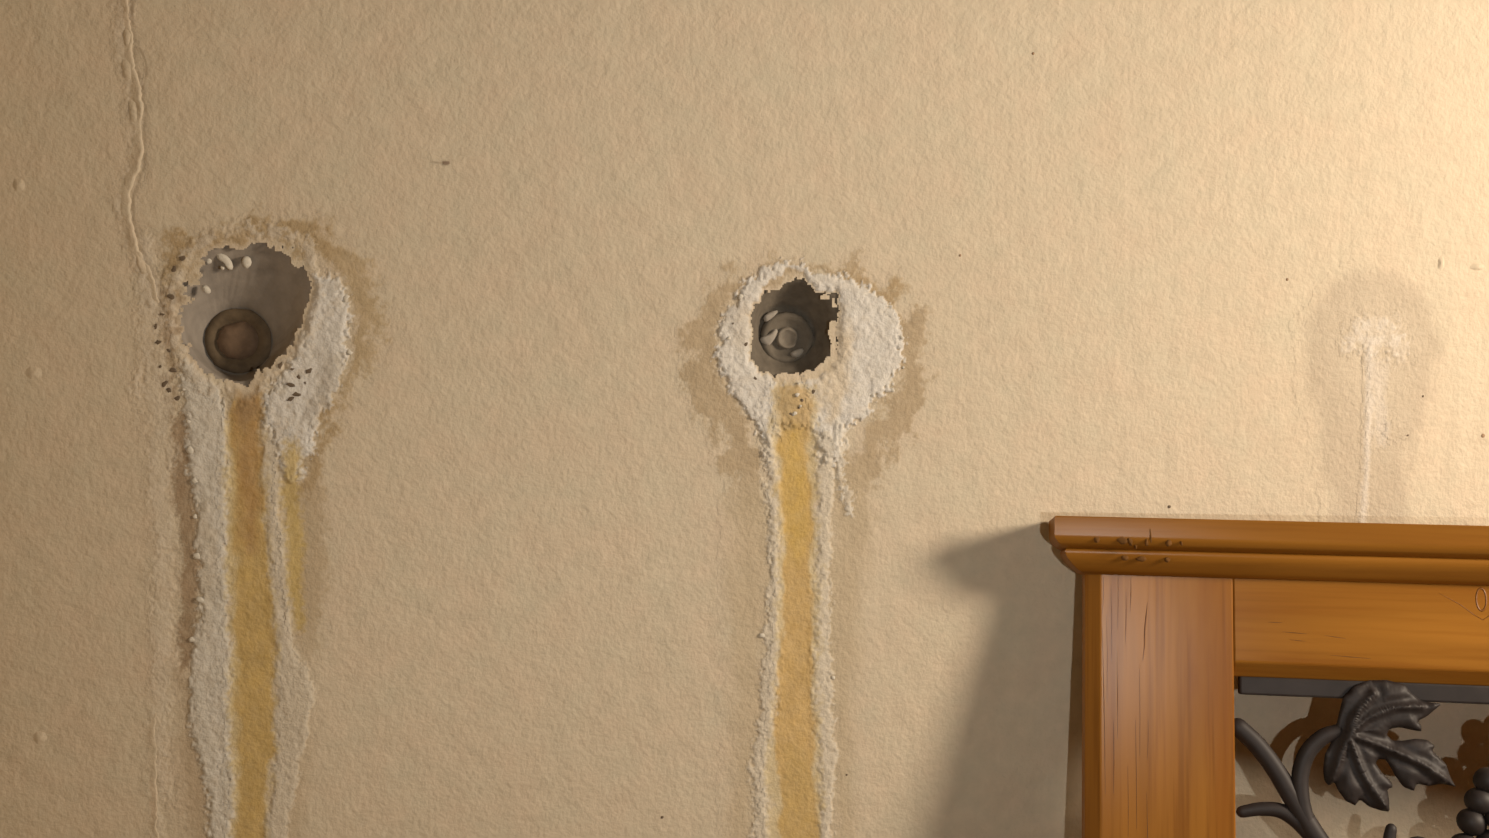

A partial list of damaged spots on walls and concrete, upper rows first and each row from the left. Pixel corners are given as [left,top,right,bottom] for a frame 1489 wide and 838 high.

spalling [178,243,312,387]
leakage [125,200,400,838]
rust [215,369,312,838]
spalling [751,277,840,378]
rust [756,294,840,838]
leakage [672,242,943,838]
leakage [1289,258,1461,524]